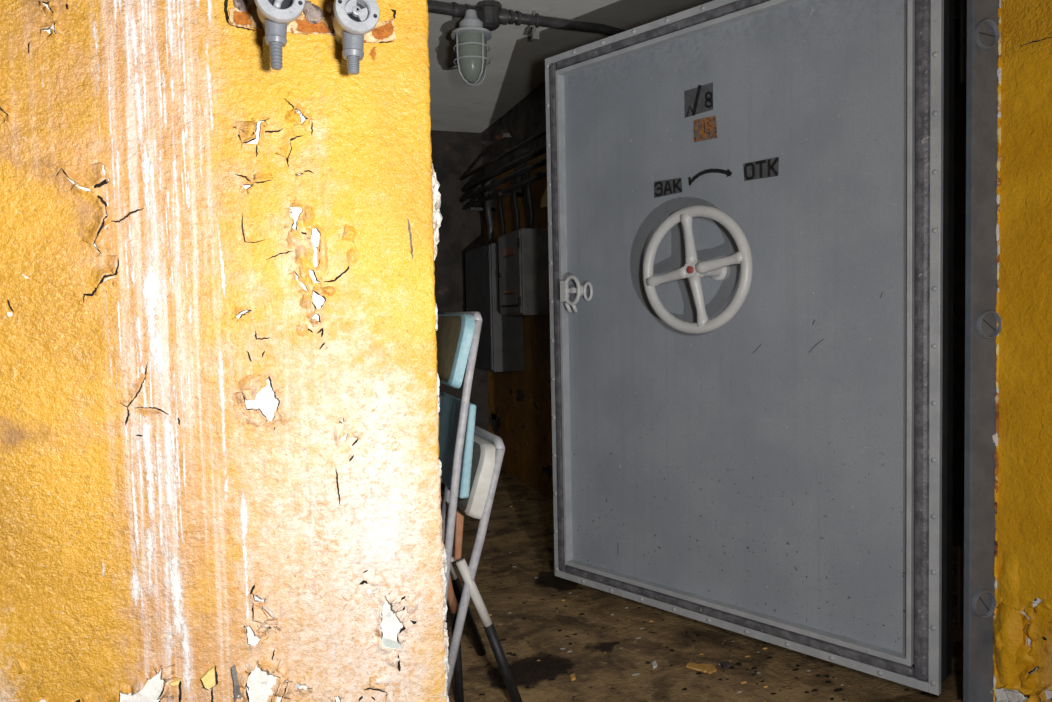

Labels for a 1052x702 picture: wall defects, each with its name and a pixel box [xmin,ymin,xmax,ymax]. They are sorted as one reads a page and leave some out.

peeling [231,99,314,157]
crack [35,159,144,302]
leakage [217,225,226,297]
peeling [267,199,360,350]
spalling [992,0,1004,514]
crack [120,362,180,437]
leakage [97,0,213,698]
leakage [213,351,234,501]
peeling [230,331,293,431]
leakage [240,493,250,619]
peeling [229,585,313,702]
peeling [359,570,418,702]